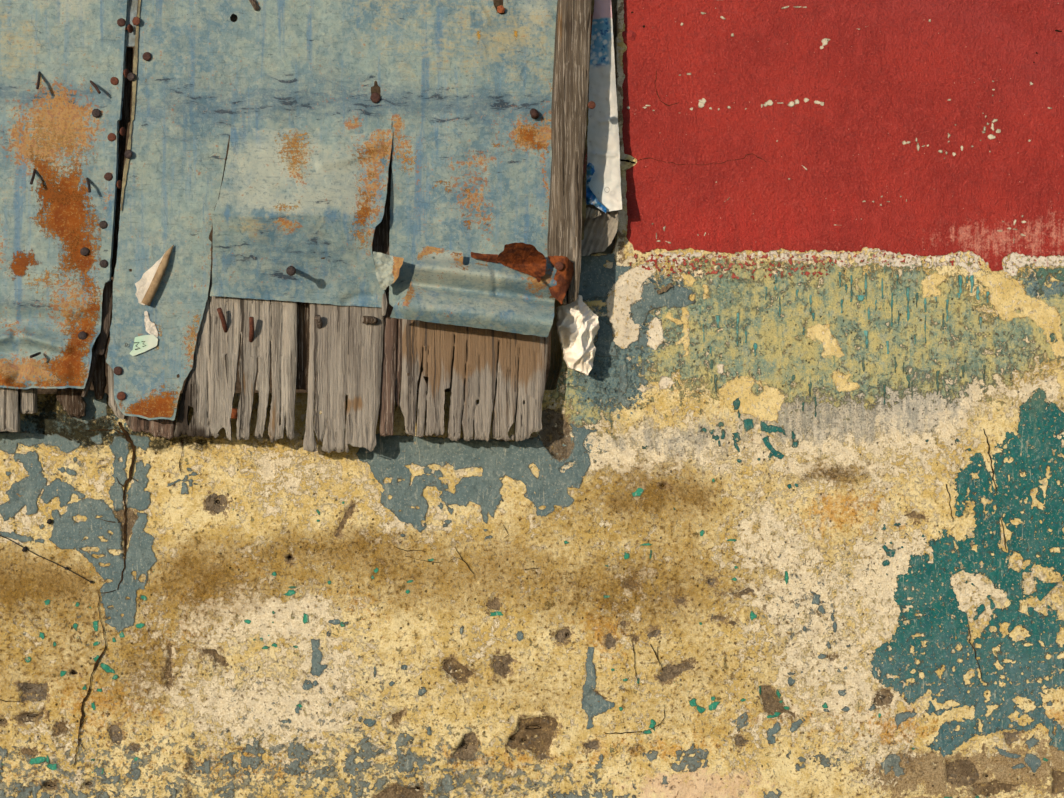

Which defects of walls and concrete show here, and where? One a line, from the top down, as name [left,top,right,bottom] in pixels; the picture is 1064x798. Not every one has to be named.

corrosion [275,130,311,171]
corrosion [351,191,375,249]
corrosion [0,117,101,387]
corrosion [452,252,499,270]
peeling [973,261,1064,399]
corrosion [119,385,180,418]
peeling [700,364,801,463]
peeling [0,431,157,680]
crack [73,422,138,766]
peeling [85,725,144,787]
flaking render [506,716,558,760]
flaking render [944,759,1019,798]